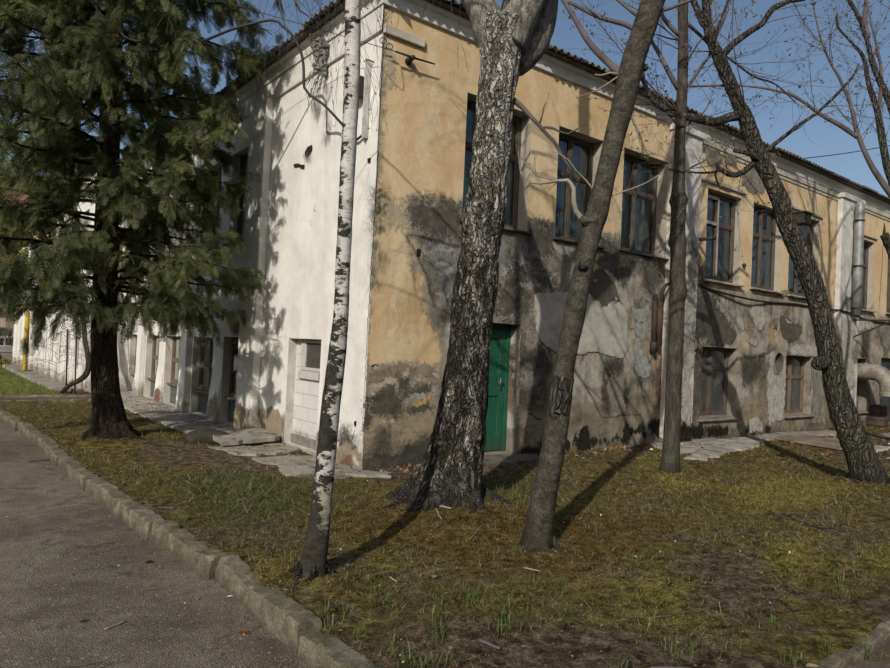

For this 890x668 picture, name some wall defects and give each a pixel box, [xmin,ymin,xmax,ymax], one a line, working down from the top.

water stain [404,194,461,306]
spalling [552,241,577,256]
flaking render [589,264,624,307]
peeling [629,308,651,378]
flaking render [681,288,745,428]
flaking render [774,315,802,342]
water stain [337,374,432,469]